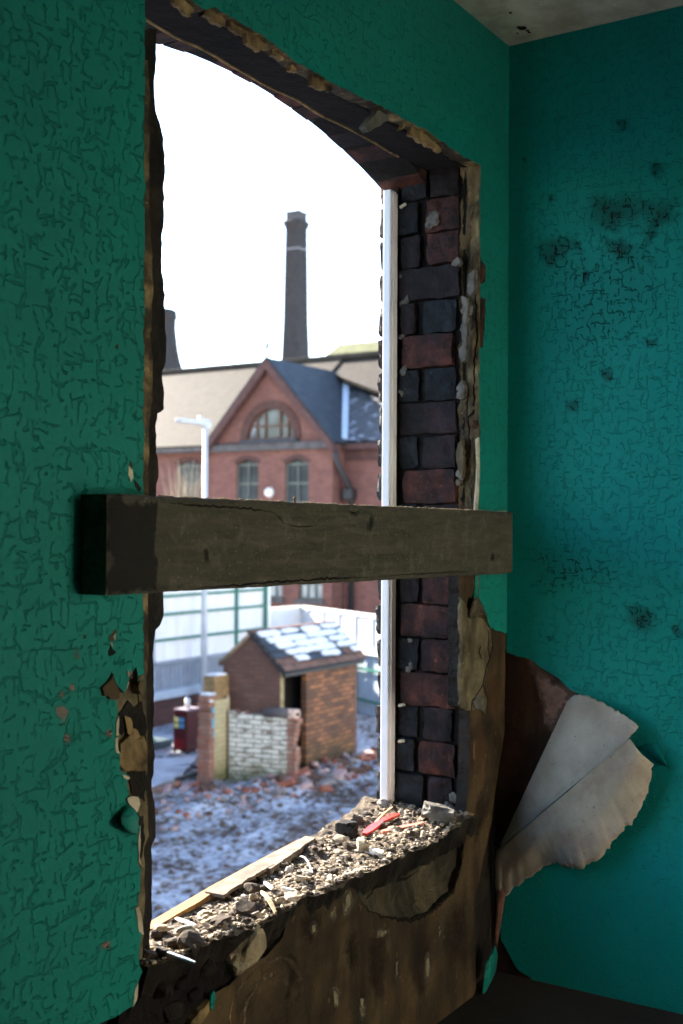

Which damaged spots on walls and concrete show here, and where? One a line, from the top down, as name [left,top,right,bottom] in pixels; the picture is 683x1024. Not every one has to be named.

spalling [170,0,332,92]
spalling [396,121,441,154]
spalling [451,257,485,363]
leakage [570,241,648,333]
spalling [456,420,480,478]
flaking render [100,575,506,1024]